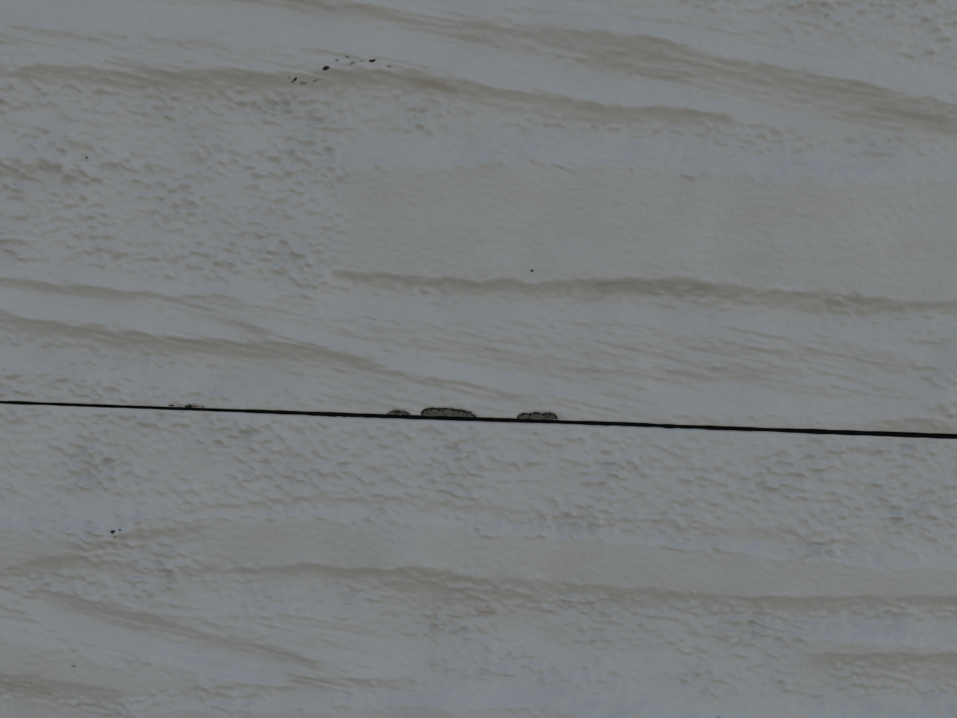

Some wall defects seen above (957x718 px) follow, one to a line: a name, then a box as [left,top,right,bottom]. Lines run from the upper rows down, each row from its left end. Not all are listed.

spalling [387,407,476,417]
spalling [516,412,561,421]